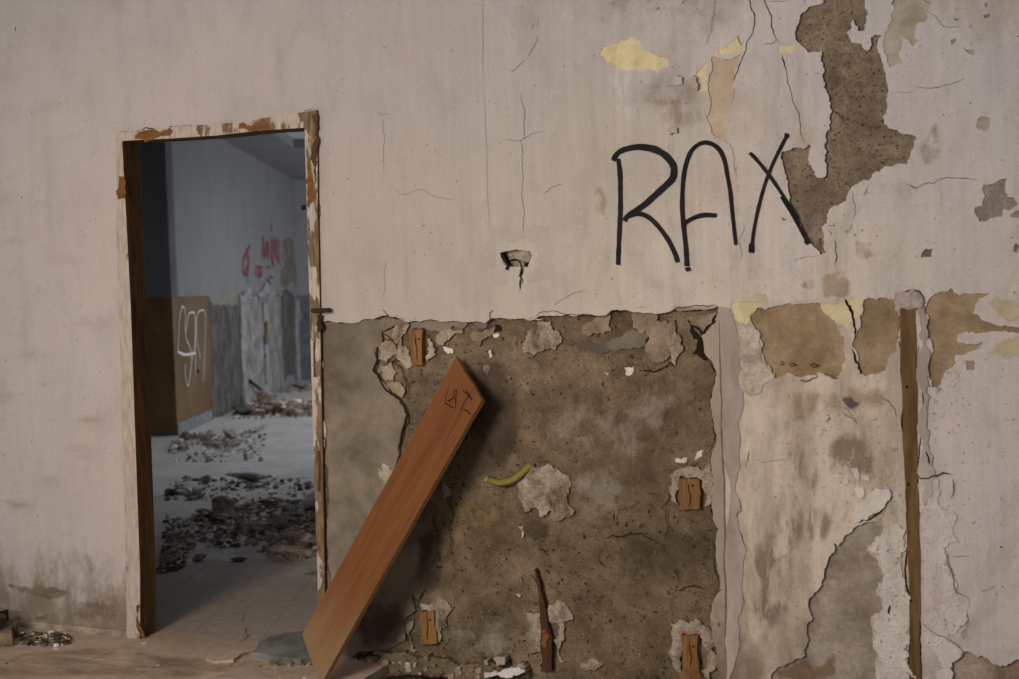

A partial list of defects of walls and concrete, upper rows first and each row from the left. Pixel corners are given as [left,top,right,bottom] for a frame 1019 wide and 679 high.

crack [484,96,562,244]
peeling [600,37,669,72]
flaking render [668,36,742,139]
crack [731,0,806,139]
flaking render [778,0,933,254]
spalling [501,250,532,276]
crack [529,290,610,319]
flaking render [731,294,900,396]
flaking render [924,289,1019,388]
flaking render [317,307,723,679]
flaking render [771,468,916,679]
peeling [917,477,1019,679]